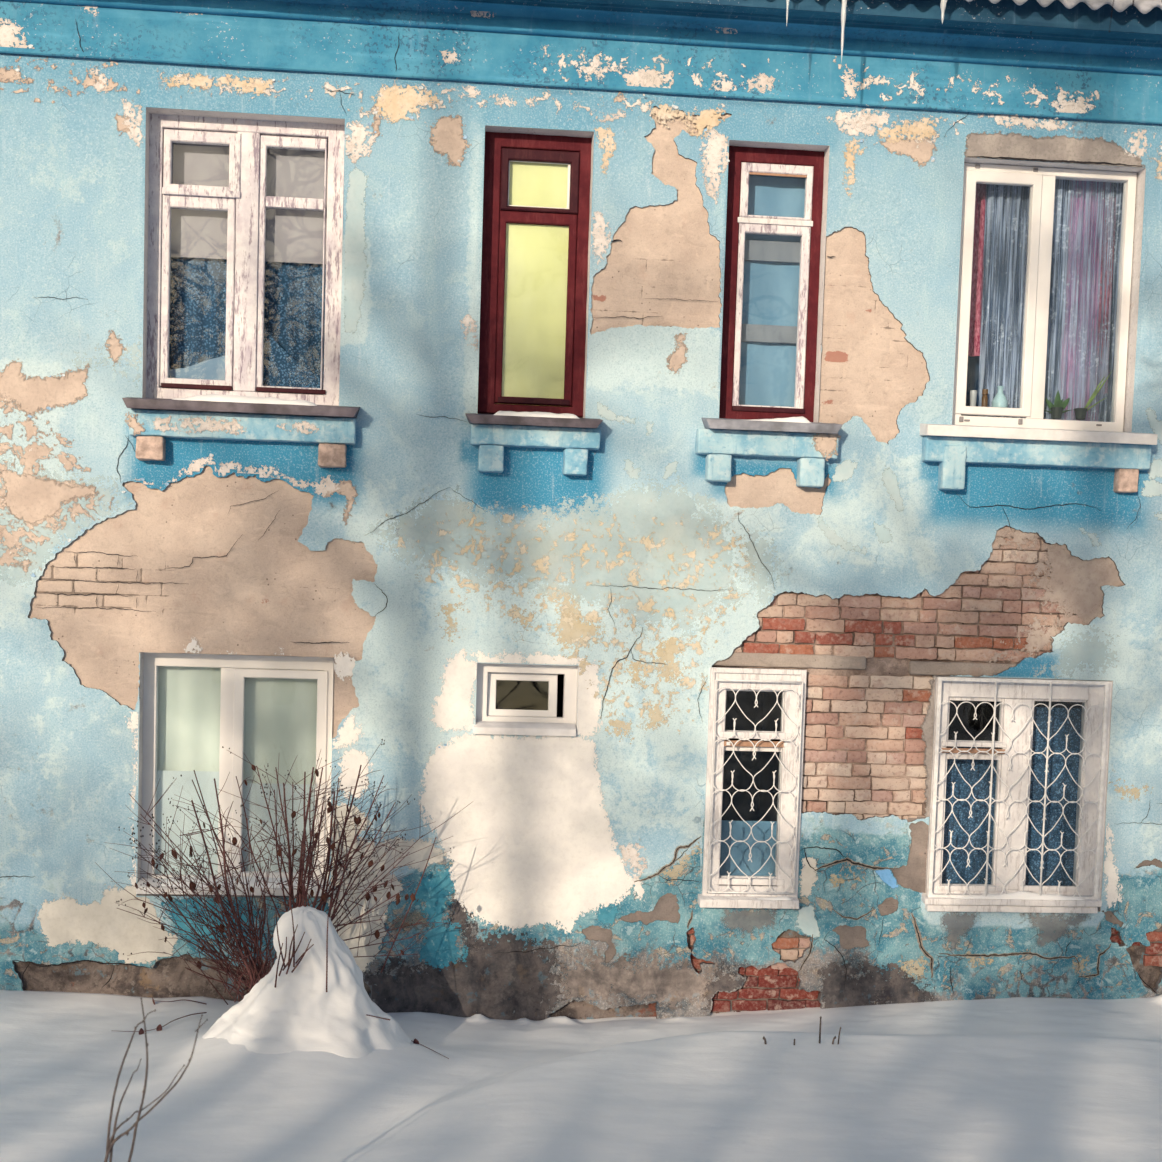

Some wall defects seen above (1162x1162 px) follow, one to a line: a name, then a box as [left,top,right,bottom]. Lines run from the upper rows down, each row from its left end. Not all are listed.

peeling [0,18,144,146]
peeling [818,56,1099,198]
spalling [157,44,779,375]
peeling [0,227,1125,893]
crack [956,493,1100,531]
crack [592,585,717,716]
crack [799,846,894,871]
damp [364,893,571,1021]
peeling [549,842,868,1020]
crack [798,908,883,988]
crack [911,913,1112,994]
spalling [1099,907,1162,992]